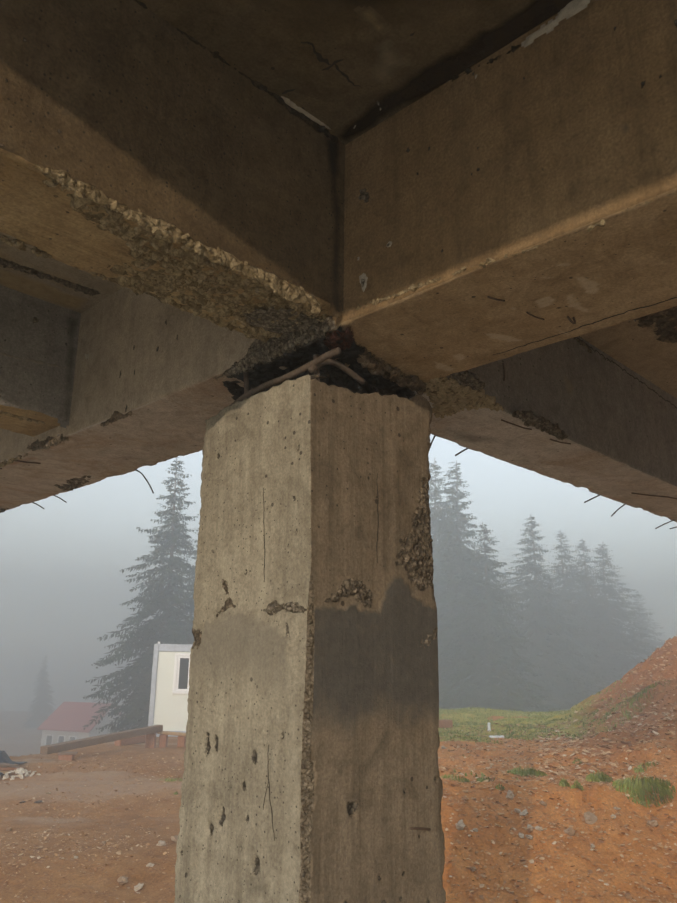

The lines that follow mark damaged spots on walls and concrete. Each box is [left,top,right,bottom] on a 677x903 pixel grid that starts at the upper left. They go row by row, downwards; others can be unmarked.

damp [225,0,576,318]
spalling [36,165,429,406]
spalling [629,306,677,343]
spalling [0,434,68,469]
spalling [263,541,313,669]
spalling [324,578,372,608]
spalling [395,475,434,591]
spalling [299,683,313,903]